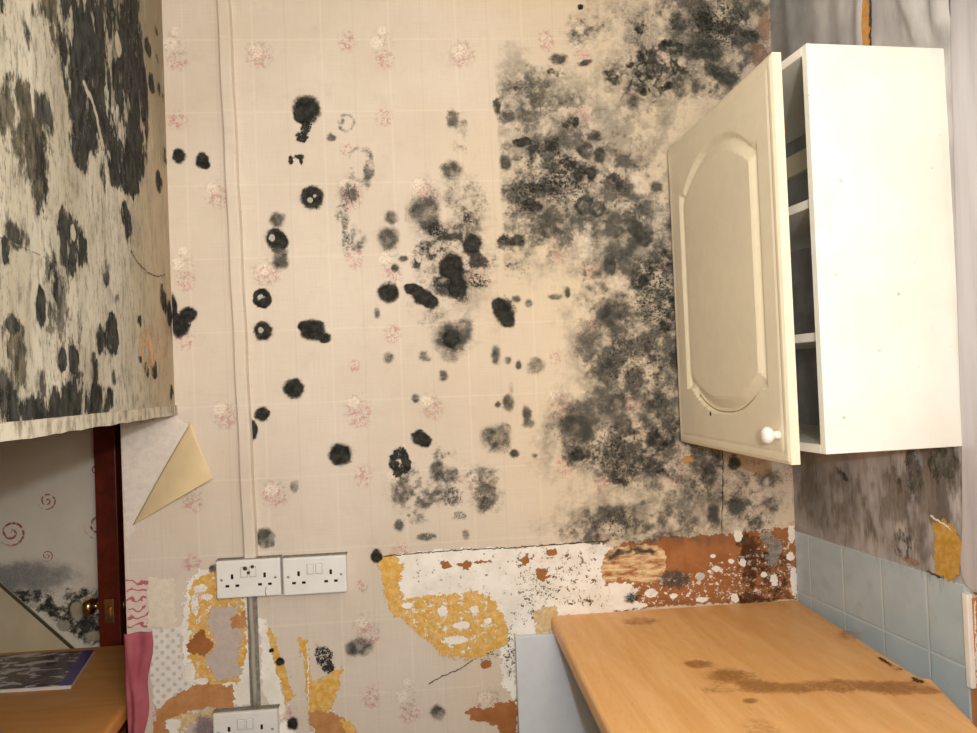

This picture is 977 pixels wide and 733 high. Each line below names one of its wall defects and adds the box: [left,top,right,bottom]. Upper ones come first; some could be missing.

leakage [603,0,768,109]
leakage [24,0,210,241]
leakage [288,95,320,165]
leakage [0,71,119,422]
leakage [298,319,331,343]
leakage [375,196,496,317]
leakage [492,54,779,545]
peeling [133,422,213,525]
leakage [388,429,466,520]
peeling [927,515,961,583]
peeling [153,568,357,733]
peeling [377,525,797,733]